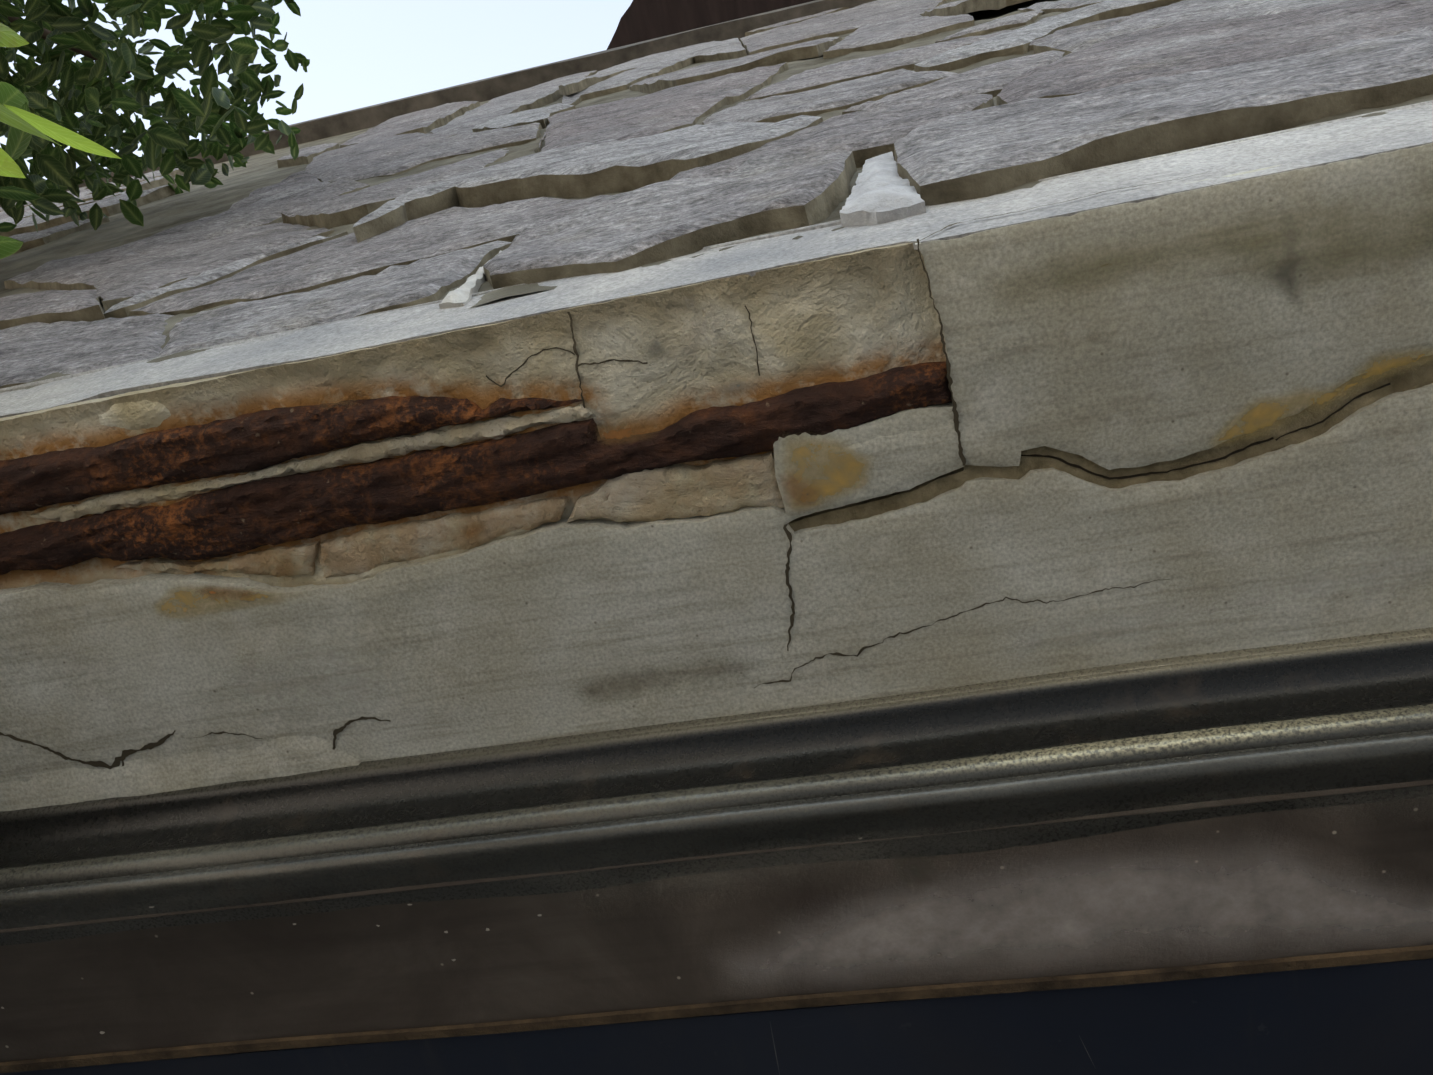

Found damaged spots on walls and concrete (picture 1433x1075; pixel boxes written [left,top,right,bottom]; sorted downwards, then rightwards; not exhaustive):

spalling [0,451,785,589]
spalling [0,243,946,534]
rust [0,361,952,575]
crack [755,171,1433,688]
rust [1218,403,1289,441]
crack [0,730,262,769]
crack [332,716,391,750]